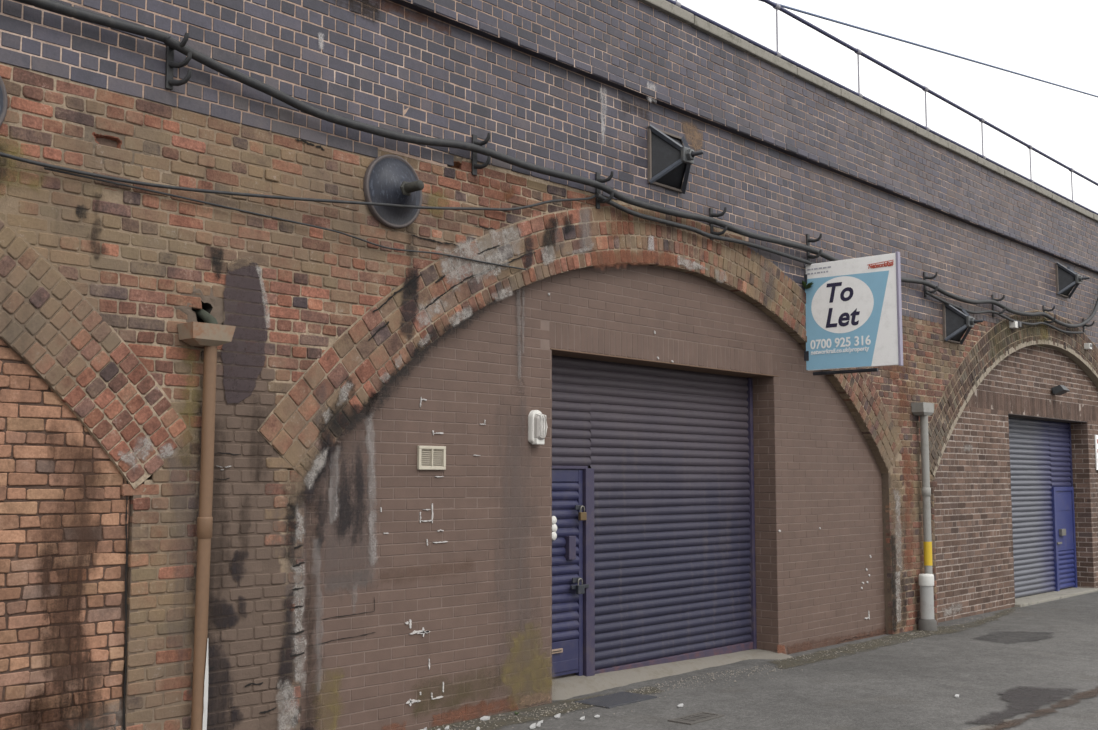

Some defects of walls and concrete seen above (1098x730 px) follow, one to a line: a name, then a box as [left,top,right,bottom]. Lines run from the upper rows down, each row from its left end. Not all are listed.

damp [401,226,441,338]
damp [442,227,533,281]
damp [207,539,243,730]
damp [278,414,377,730]